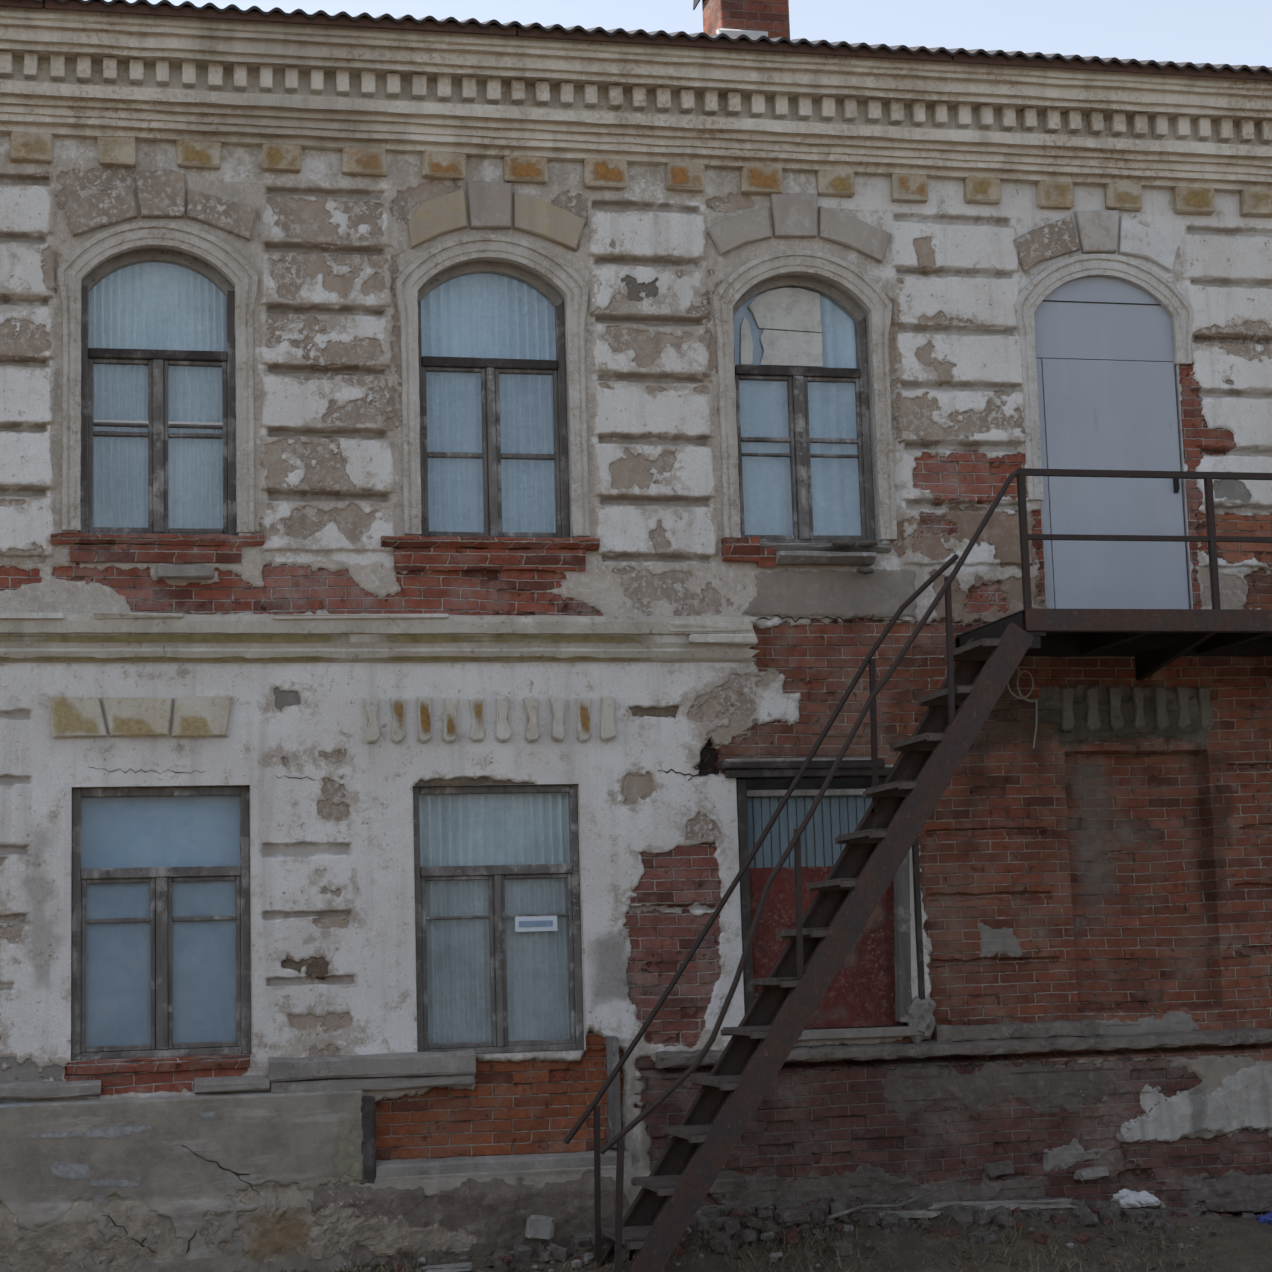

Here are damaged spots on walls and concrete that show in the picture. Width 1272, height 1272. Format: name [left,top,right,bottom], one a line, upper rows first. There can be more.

peeling [251,179,461,544]
peeling [1193,320,1272,362]
spalling [1179,362,1272,609]
spalling [0,541,603,616]
spalling [609,294,1047,775]
peeling [274,687,300,711]
peeling [317,748,350,822]
spalling [281,956,329,980]
spalling [375,811,722,1171]
spalling [723,657,1272,1215]
crack [182,1145,260,1195]
peeling [0,1175,366,1272]